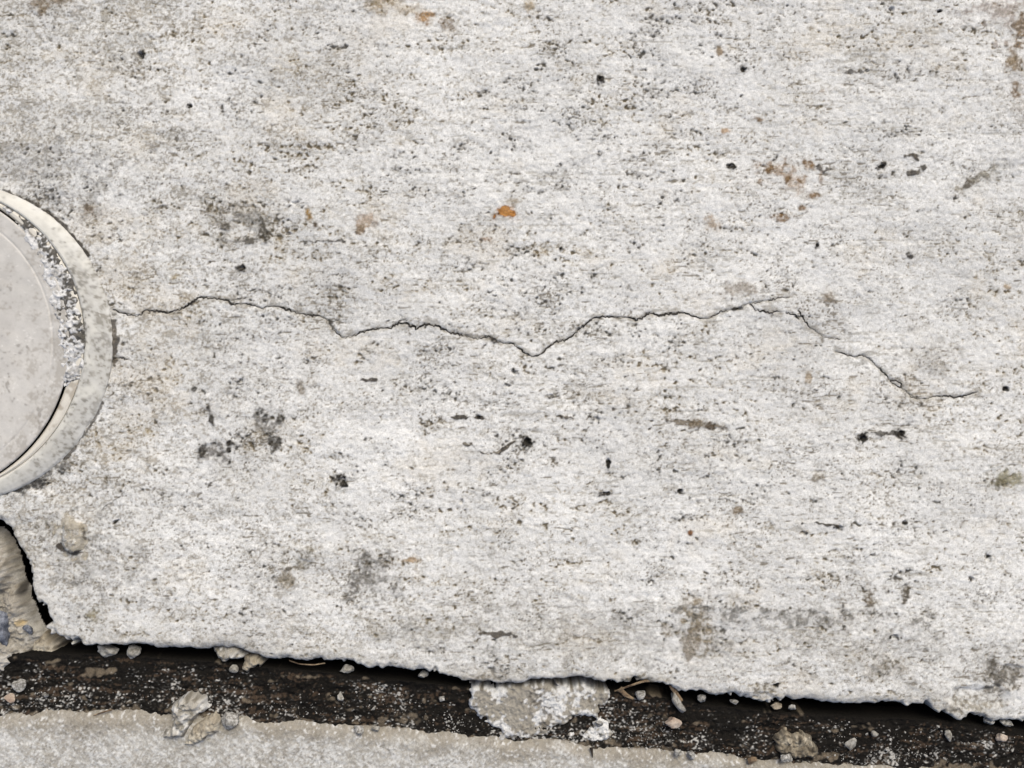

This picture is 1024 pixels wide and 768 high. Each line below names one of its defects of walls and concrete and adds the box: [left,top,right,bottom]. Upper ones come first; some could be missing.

crack [113,296,976,399]